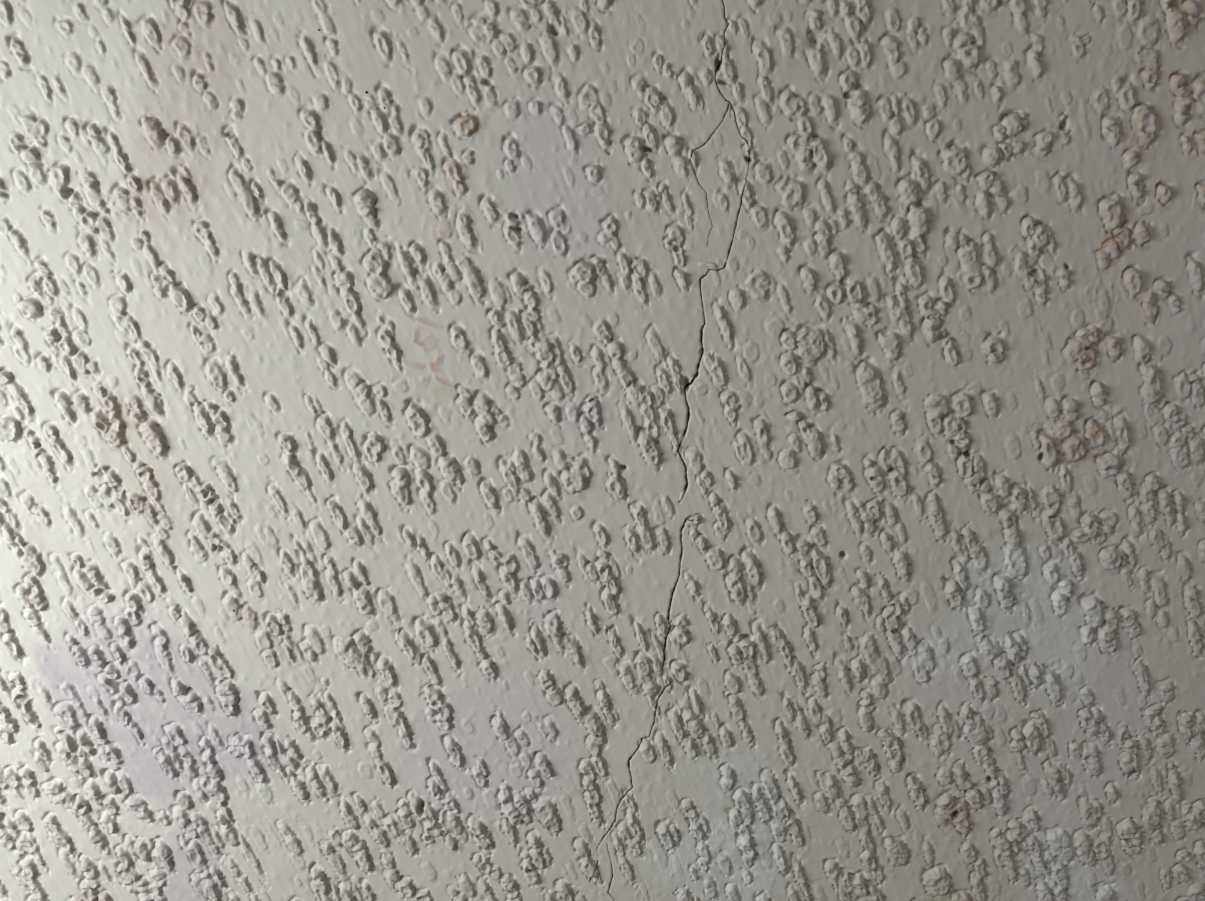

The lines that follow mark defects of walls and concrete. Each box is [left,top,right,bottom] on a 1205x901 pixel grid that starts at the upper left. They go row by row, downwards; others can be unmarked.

crack [590,0,750,899]